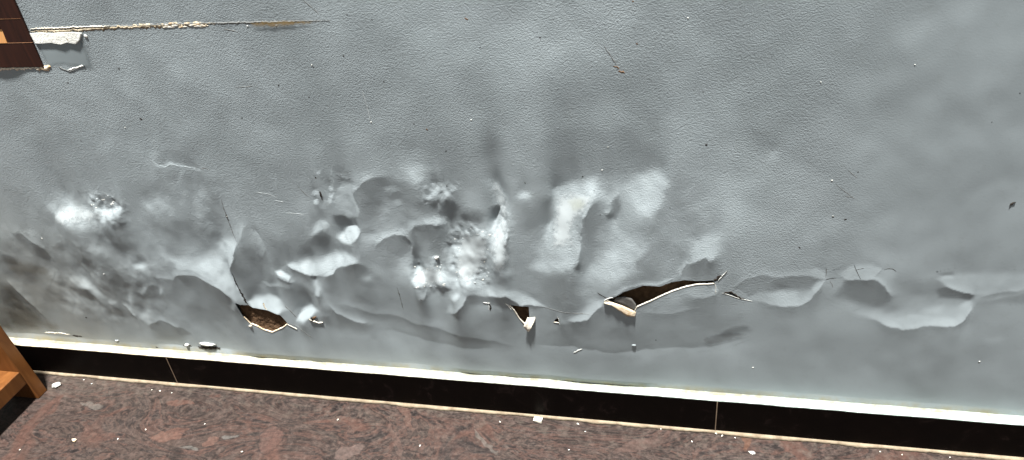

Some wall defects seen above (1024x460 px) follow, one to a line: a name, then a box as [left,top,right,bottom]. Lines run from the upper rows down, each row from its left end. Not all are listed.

peeling [129,21,213,30]
damp [56,210,107,223]
damp [456,186,506,280]
damp [554,196,588,245]
flaking render [612,280,714,307]
flaking render [238,304,287,331]
flaking render [512,305,529,322]